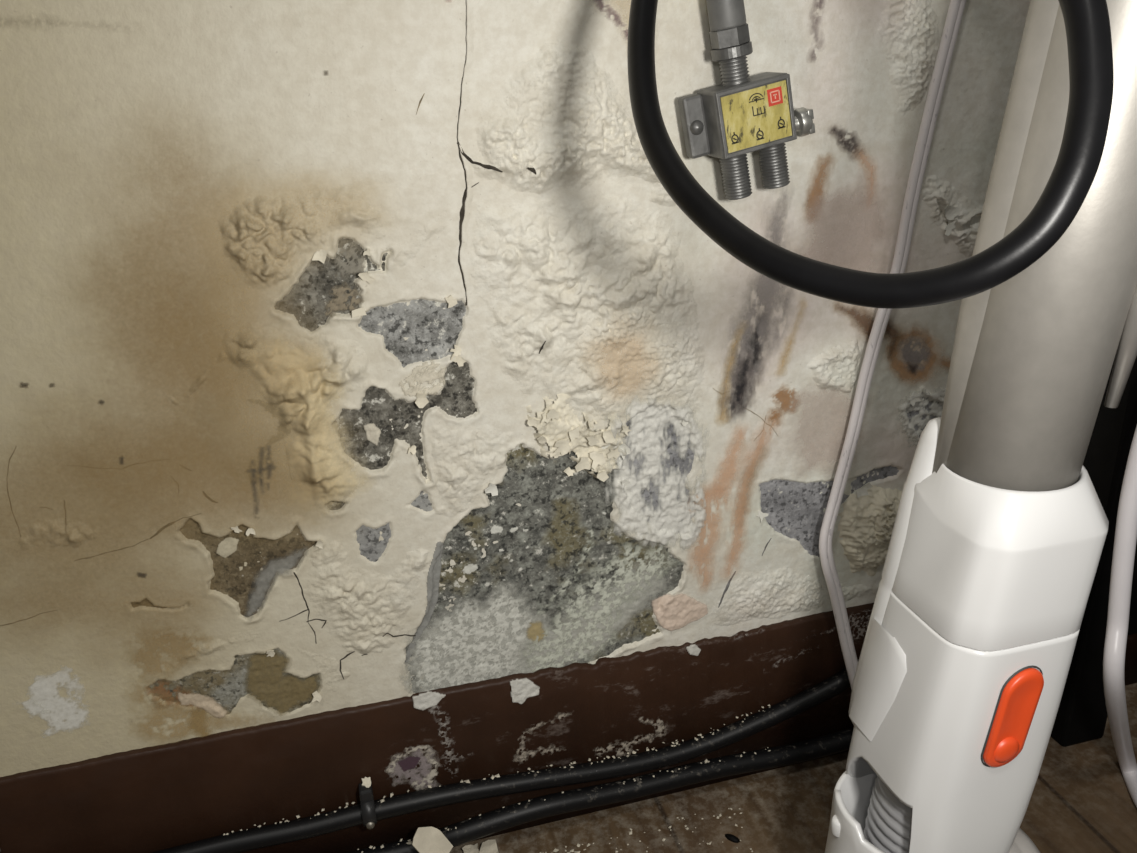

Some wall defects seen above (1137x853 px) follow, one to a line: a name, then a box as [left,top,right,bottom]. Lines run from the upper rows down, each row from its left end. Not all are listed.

crack [457,0,536,306]
water stain [252,342,356,505]
spalling [274,238,477,512]
corrosion [770,390,798,421]
corrosion [836,304,950,380]
peeling [180,518,324,617]
spalling [405,394,708,693]
corrosion [695,433,764,582]
spalling [756,465,899,557]
spalling [147,648,322,737]